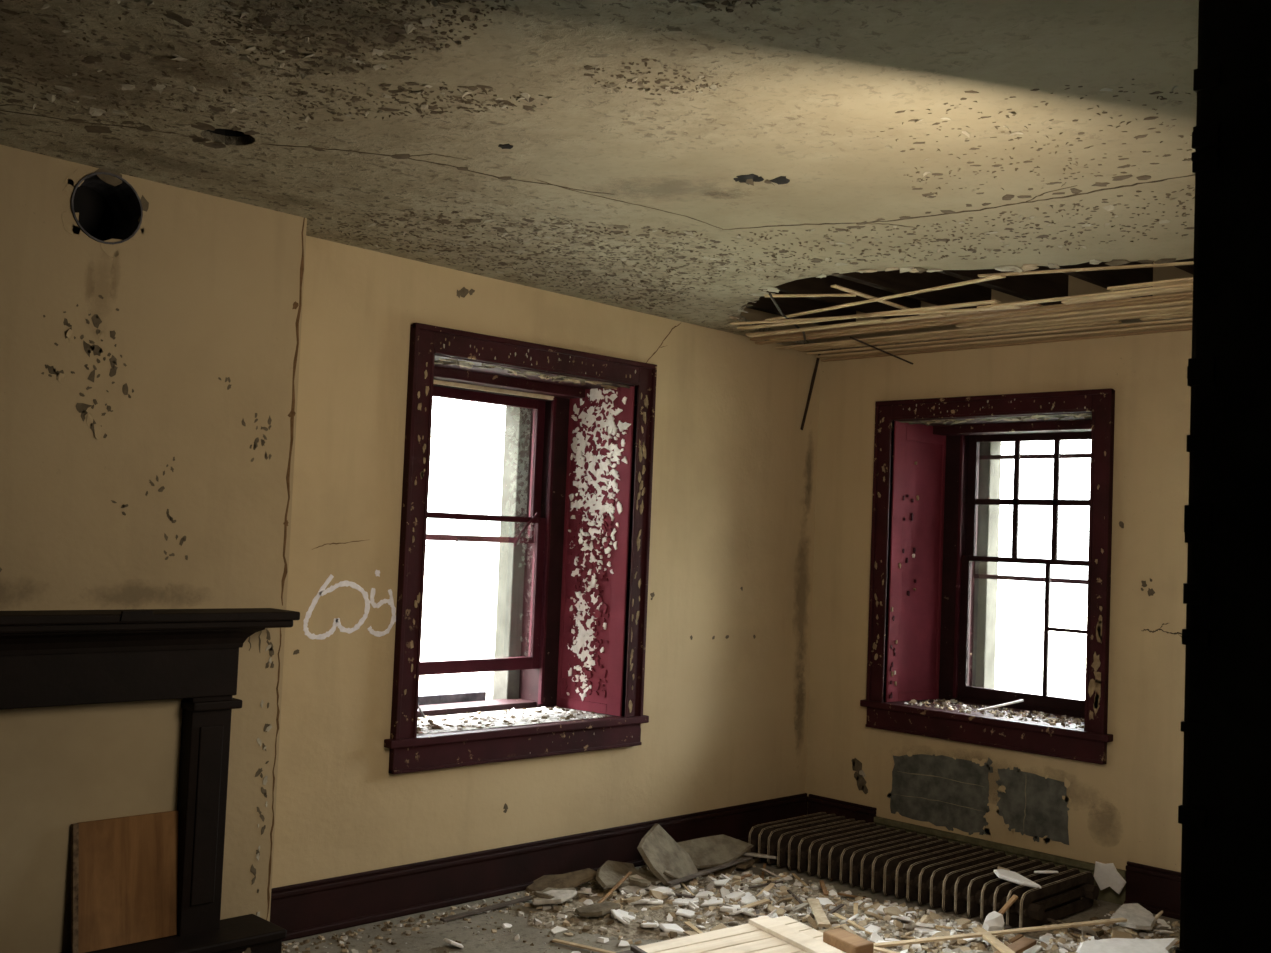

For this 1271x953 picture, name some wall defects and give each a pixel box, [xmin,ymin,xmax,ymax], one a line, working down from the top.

peeling [41,304,134,440]
peeling [417,337,649,743]
spalling [628,572,655,713]
peeling [887,751,1071,845]